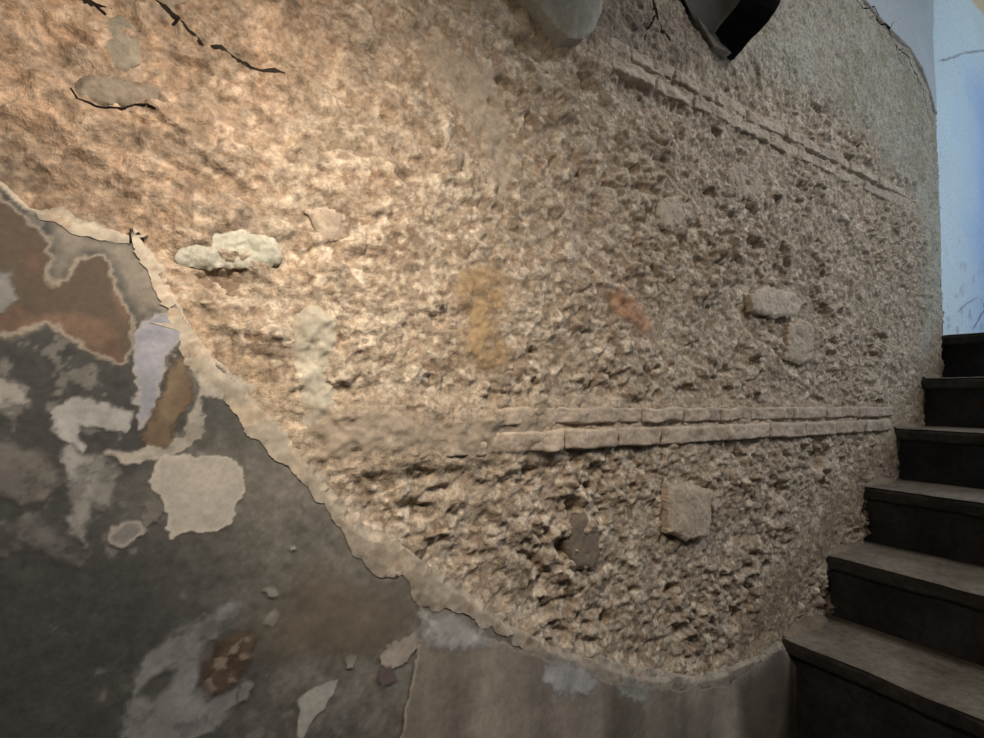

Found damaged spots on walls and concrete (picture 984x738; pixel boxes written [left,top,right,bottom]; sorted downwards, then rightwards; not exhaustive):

crack [81,0,112,16]
spalling [74,74,160,107]
spalling [104,14,142,72]
crack [155,0,285,74]
peeling [0,194,181,430]
spalling [36,207,296,470]
water stain [458,267,508,369]
peeling [50,397,133,542]
peeling [104,367,245,548]
spalling [291,448,514,637]
spalling [557,512,600,571]
peeling [378,629,797,738]